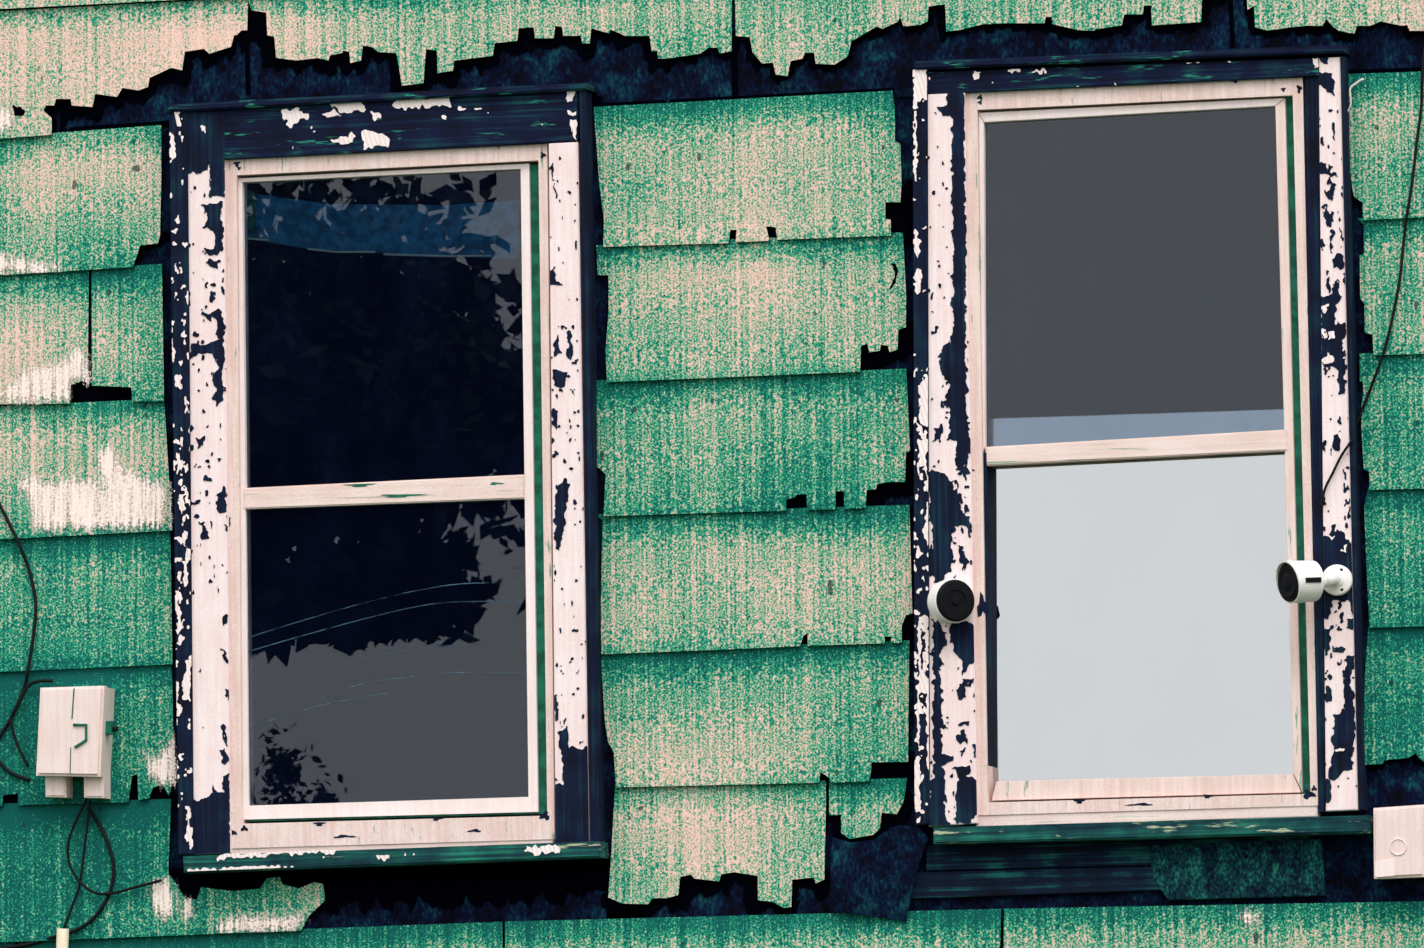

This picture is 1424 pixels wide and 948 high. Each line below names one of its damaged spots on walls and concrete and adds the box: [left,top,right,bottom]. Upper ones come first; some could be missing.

peeling [281,98,489,150]
peeling [541,152,578,223]
peeling [550,236,578,301]
peeling [566,91,578,139]
peeling [1312,58,1364,396]
peeling [169,112,356,871]
peeling [346,483,428,498]
peeling [524,325,589,856]
peeling [913,69,993,826]
peeling [1303,416,1357,803]